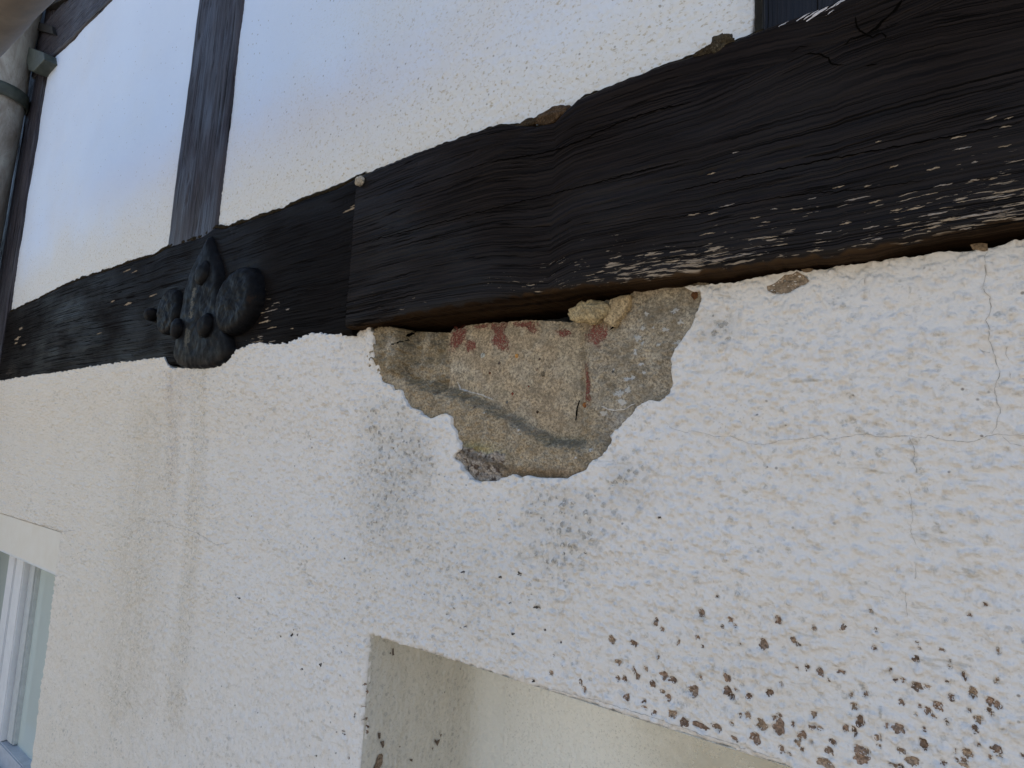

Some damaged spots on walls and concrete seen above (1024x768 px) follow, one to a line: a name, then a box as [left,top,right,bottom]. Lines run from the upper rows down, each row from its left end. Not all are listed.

flaking render [367,282,709,482]
crack [669,254,1024,616]